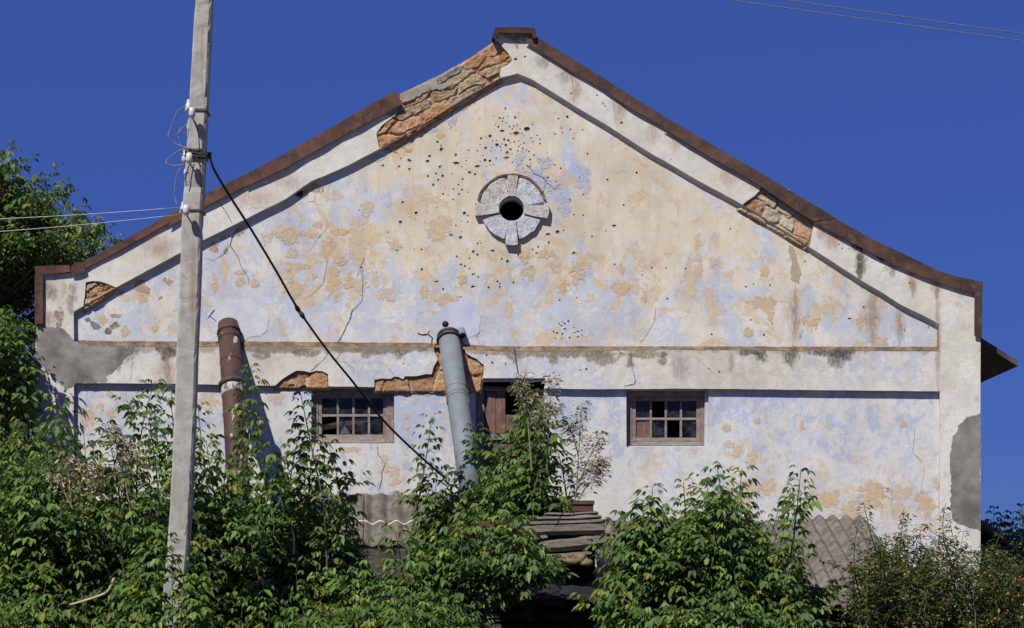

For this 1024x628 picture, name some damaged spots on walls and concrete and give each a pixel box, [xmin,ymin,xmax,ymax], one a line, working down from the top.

flaking render [368,40,592,217]
flaking render [736,187,813,284]
water stain [852,244,865,279]
flaking render [83,277,172,336]
crack [312,259,364,373]
flaking render [267,371,330,405]
flaking render [373,342,445,430]
flaking render [460,342,506,394]
water stain [785,347,851,367]